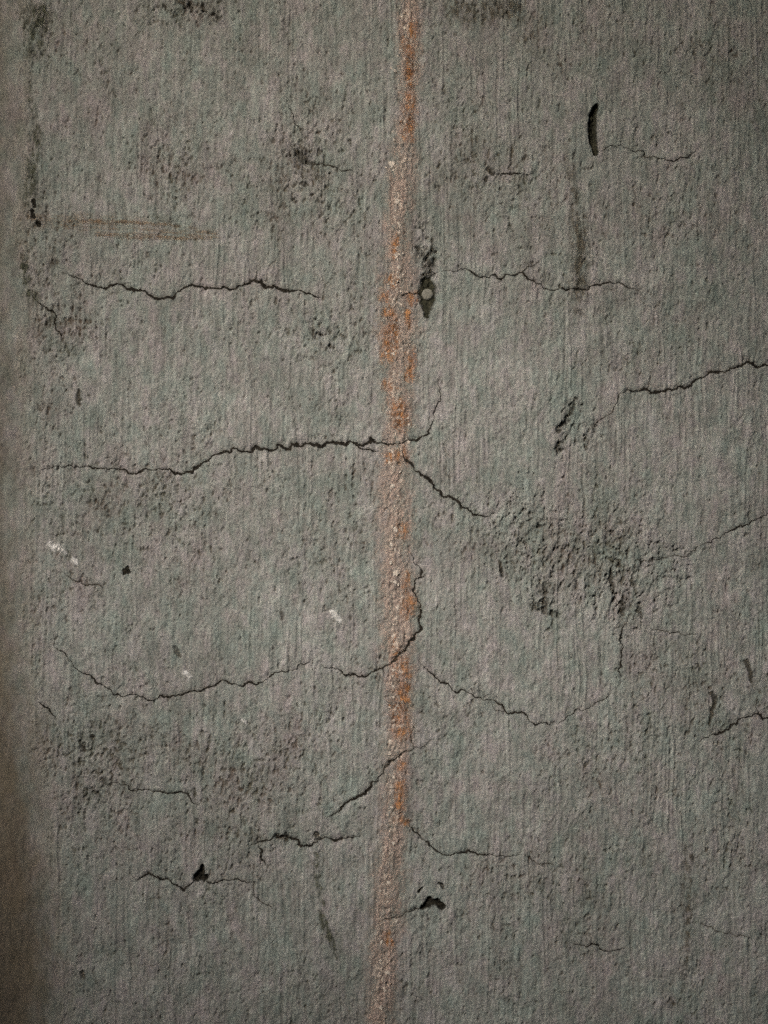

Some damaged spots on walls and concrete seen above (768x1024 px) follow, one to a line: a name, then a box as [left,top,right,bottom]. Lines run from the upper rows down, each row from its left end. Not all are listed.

spalling [588,104,598,156]
crack [63,272,325,300]
crack [400,262,642,296]
crack [34,385,493,521]
corrosion [368,0,422,1024]
crack [594,361,768,427]
crack [50,549,697,726]
crack [132,721,431,909]